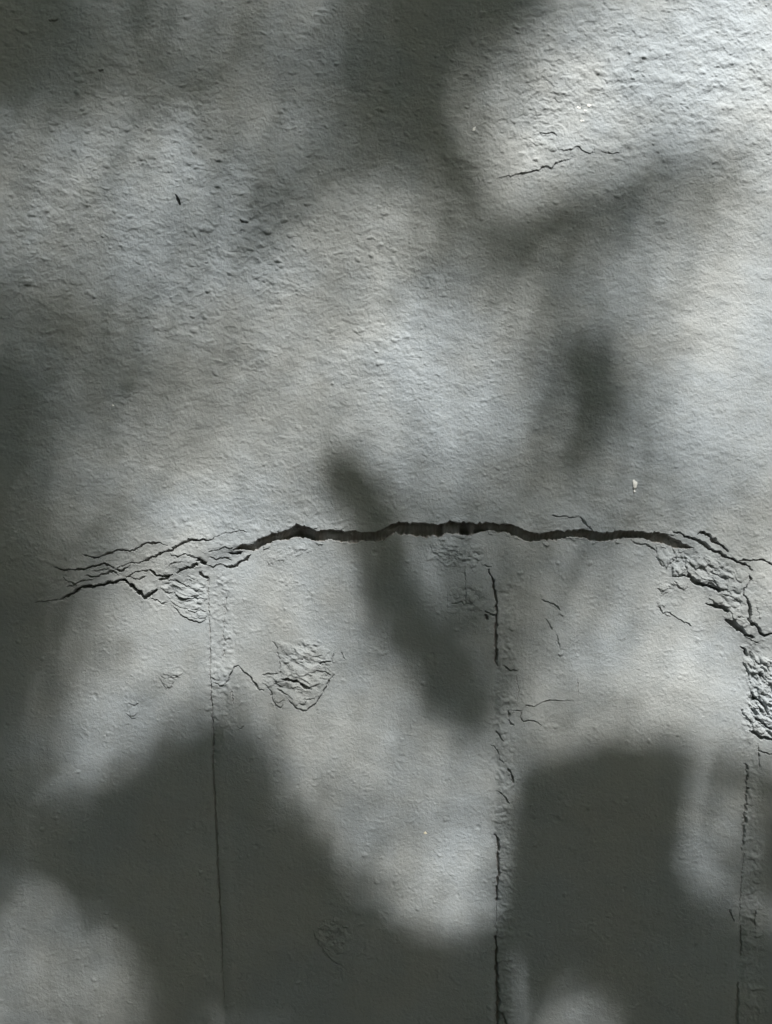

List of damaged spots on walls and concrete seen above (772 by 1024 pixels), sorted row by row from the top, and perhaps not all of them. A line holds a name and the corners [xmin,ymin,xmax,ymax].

crack [496,131,623,179]
spalling [156,571,209,624]
spalling [237,638,346,713]
spalling [655,544,772,741]
crack [33,514,772,1024]